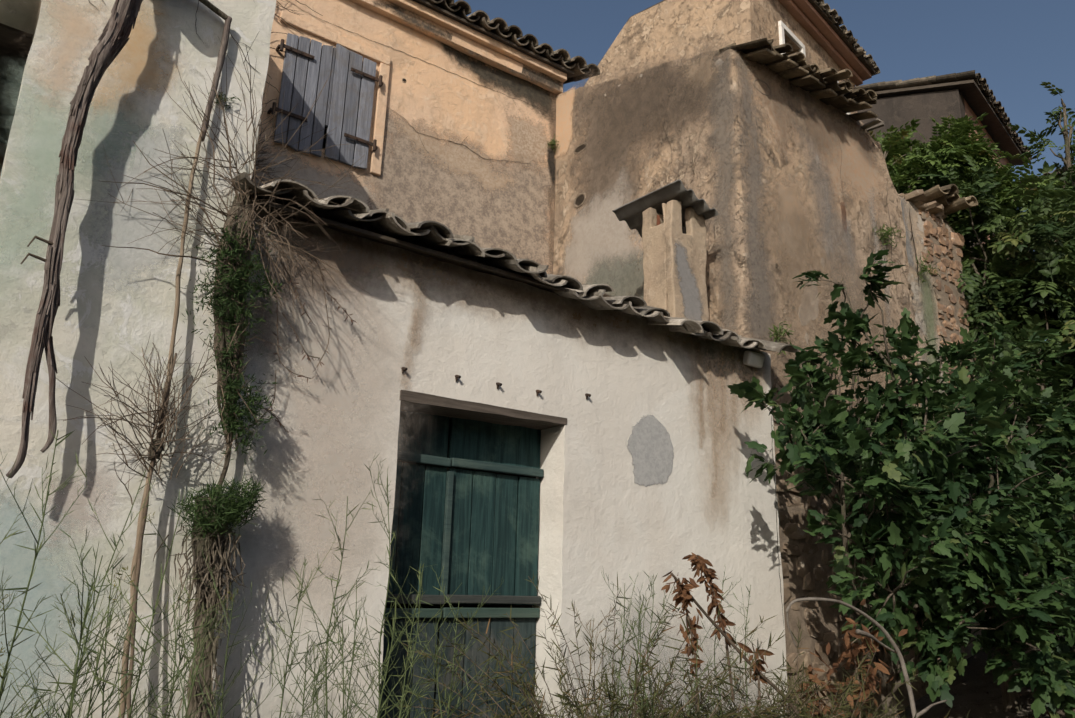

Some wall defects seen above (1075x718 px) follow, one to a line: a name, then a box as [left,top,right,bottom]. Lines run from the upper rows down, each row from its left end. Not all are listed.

peeling [395,118,516,192]
crack [389,108,530,164]
leakage [245,215,759,376]
peeling [506,115,550,167]
leakage [366,0,796,352]
leakage [777,110,890,326]